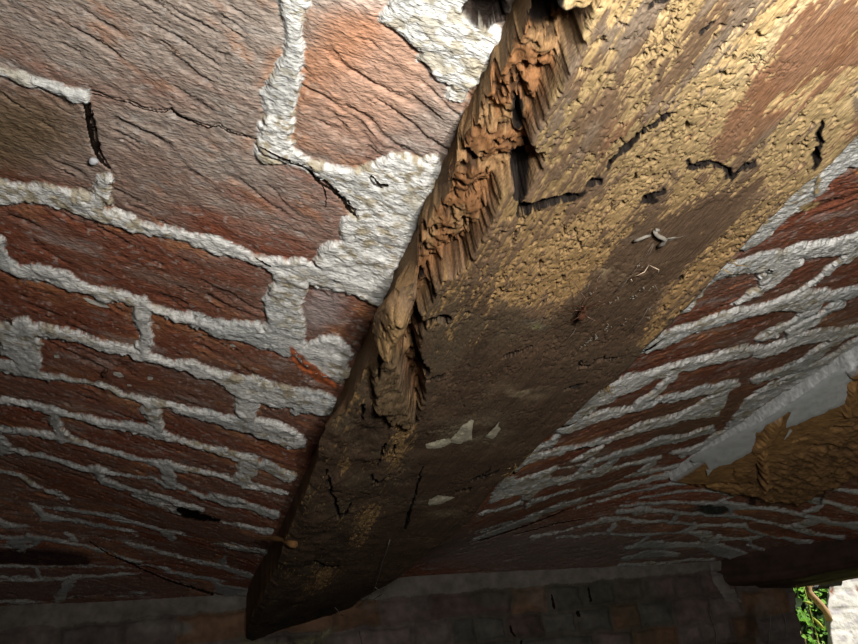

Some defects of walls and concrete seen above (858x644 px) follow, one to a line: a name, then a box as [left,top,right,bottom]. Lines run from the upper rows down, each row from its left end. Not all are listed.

crack [84,93,359,217]
peeling [691,367,853,476]